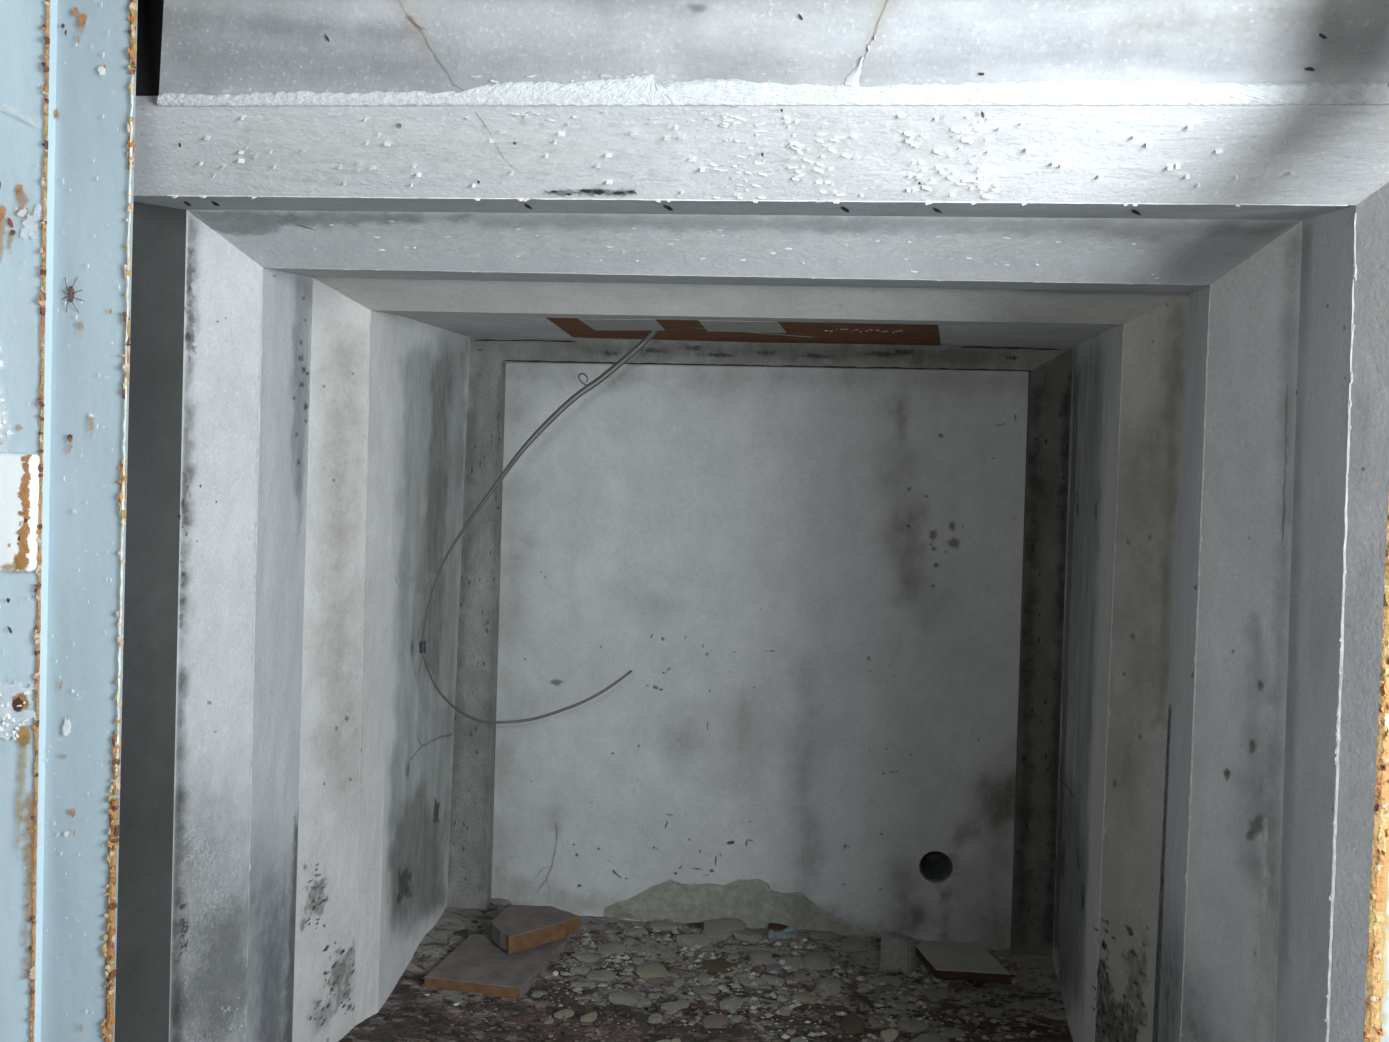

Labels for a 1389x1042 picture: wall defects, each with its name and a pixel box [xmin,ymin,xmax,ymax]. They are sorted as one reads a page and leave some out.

corrosion [127,0,137,74]
crack [844,35,876,88]
corrosion [127,135,135,170]
corrosion [109,309,130,399]
corrosion [0,0,87,1042]
corrosion [117,459,127,510]
peeling [0,679,36,741]
corrosion [1363,497,1389,1042]
corrosion [101,730,121,1042]
water stain [171,792,326,1042]
water stain [1091,708,1197,1042]